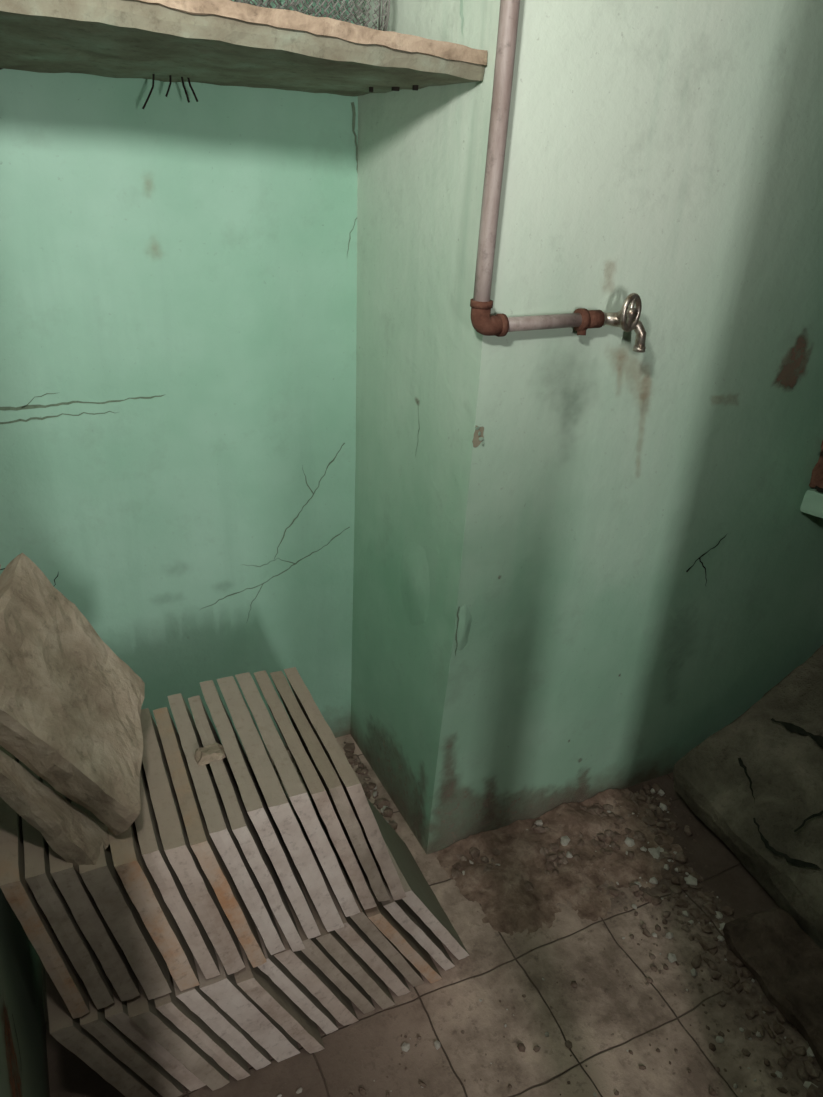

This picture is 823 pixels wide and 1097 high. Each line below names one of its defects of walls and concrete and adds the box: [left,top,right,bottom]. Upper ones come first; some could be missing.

peeling [775,336,807,388]
crack [0,393,166,424]
crack [204,443,350,621]
crack [771,718,823,748]
crack [738,758,823,869]